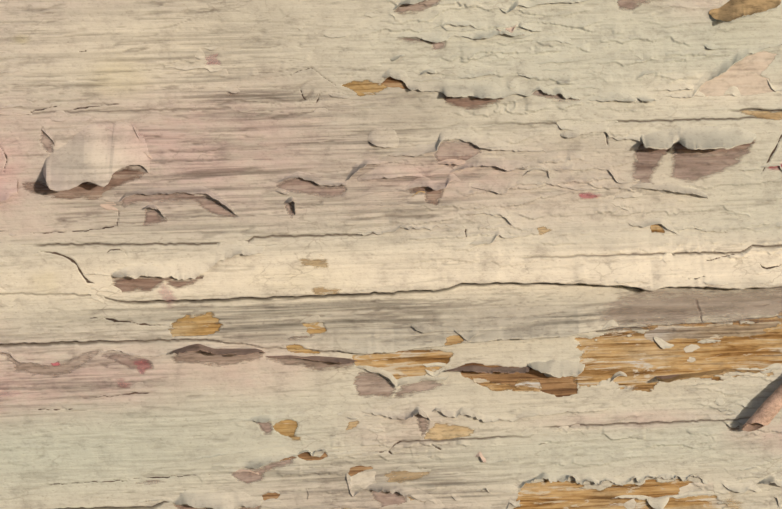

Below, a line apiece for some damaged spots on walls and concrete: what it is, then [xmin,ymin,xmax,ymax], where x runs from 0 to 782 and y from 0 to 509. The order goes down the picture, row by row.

peeling [381,0,782,109]
peeling [23,111,236,225]
peeling [275,127,547,215]
peeling [630,123,782,199]
peeling [627,213,729,235]
peeling [83,240,265,292]
peeling [578,272,782,337]
peeling [230,406,575,440]
peeling [655,363,782,432]
peeling [138,451,330,509]
peeling [346,466,492,509]
peeling [476,472,720,509]